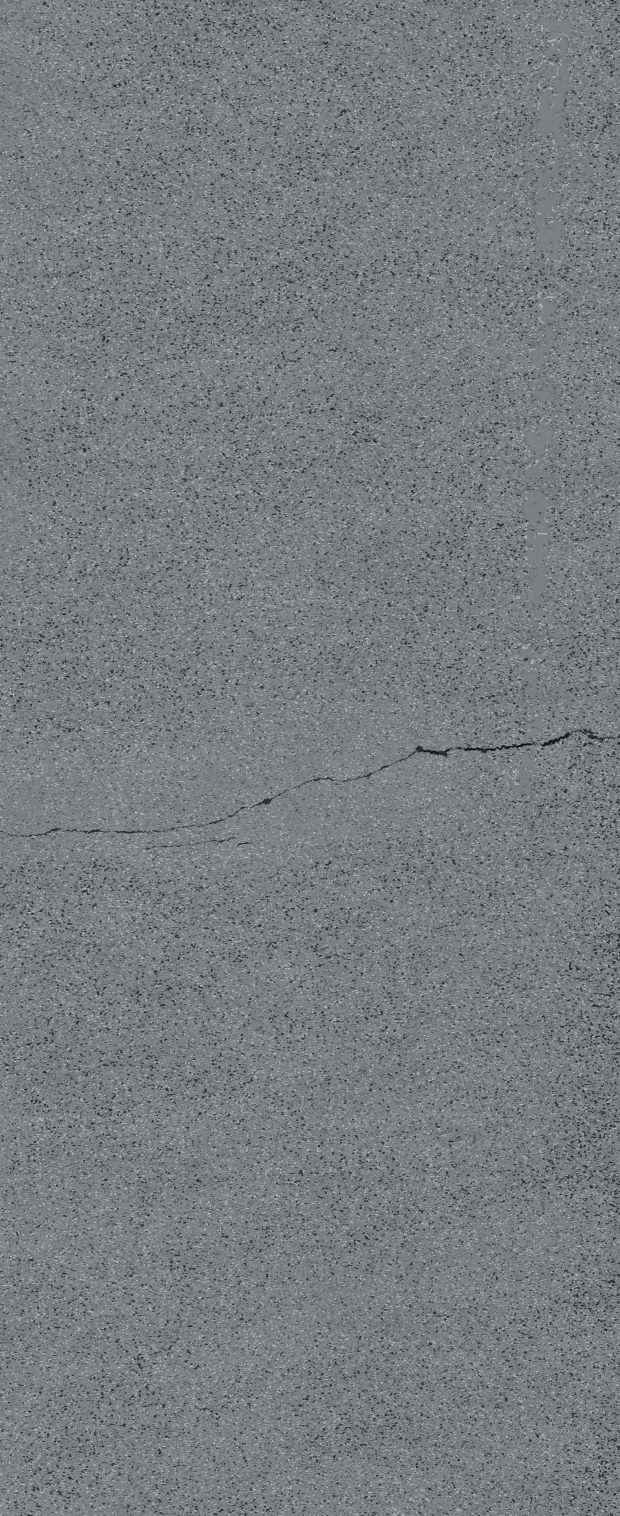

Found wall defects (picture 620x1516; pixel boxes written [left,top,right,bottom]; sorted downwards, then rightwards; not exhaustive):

crack [0,729,620,849]